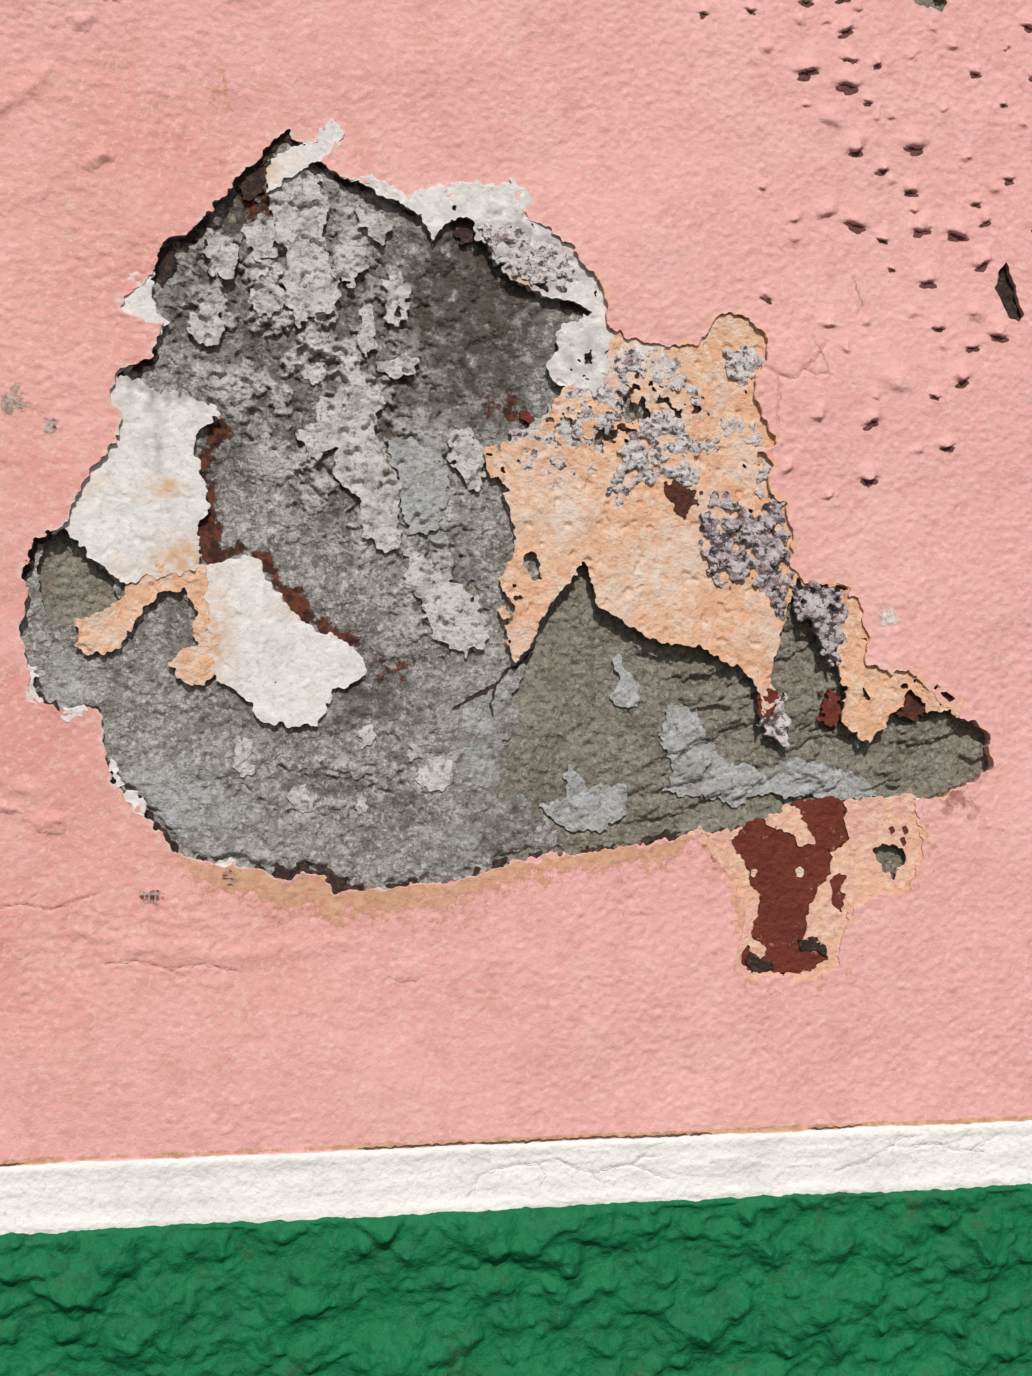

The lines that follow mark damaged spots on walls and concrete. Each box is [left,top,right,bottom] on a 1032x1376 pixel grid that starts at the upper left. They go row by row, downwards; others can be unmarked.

spalling [914,0,946,12]
spalling [995,266,1021,322]
spalling [19,119,988,979]
rust [888,806,939,857]
crack [808,1123,862,1131]
crack [359,1132,712,1195]
crack [839,1136,991,1171]